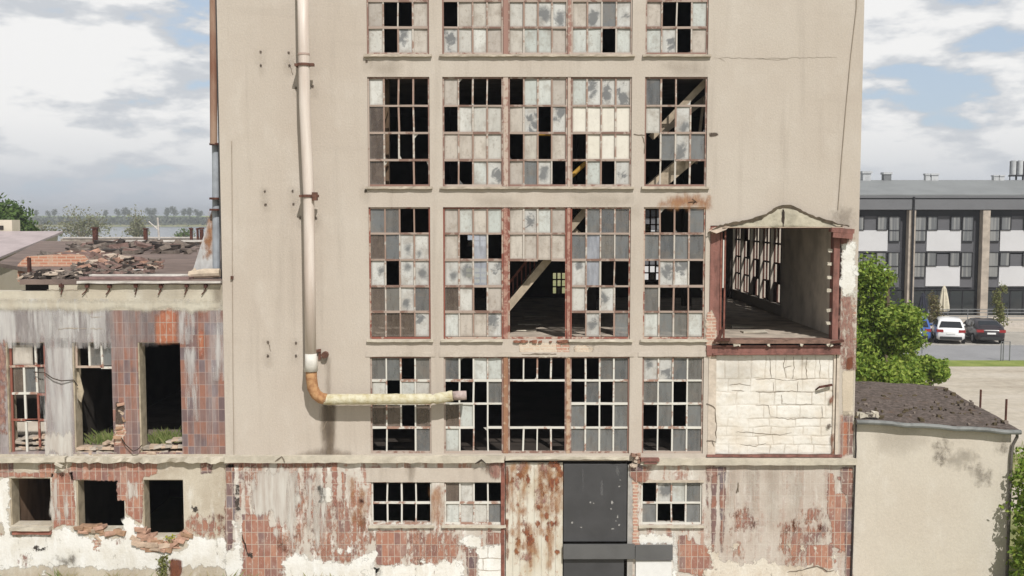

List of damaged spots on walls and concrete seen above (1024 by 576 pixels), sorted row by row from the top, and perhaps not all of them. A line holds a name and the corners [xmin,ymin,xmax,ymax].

crack [714,55,832,63]
peeling [155,309,177,343]
peeling [0,340,501,576]
peeling [618,241,859,576]
crack [706,357,823,447]
corrosion [486,461,564,564]